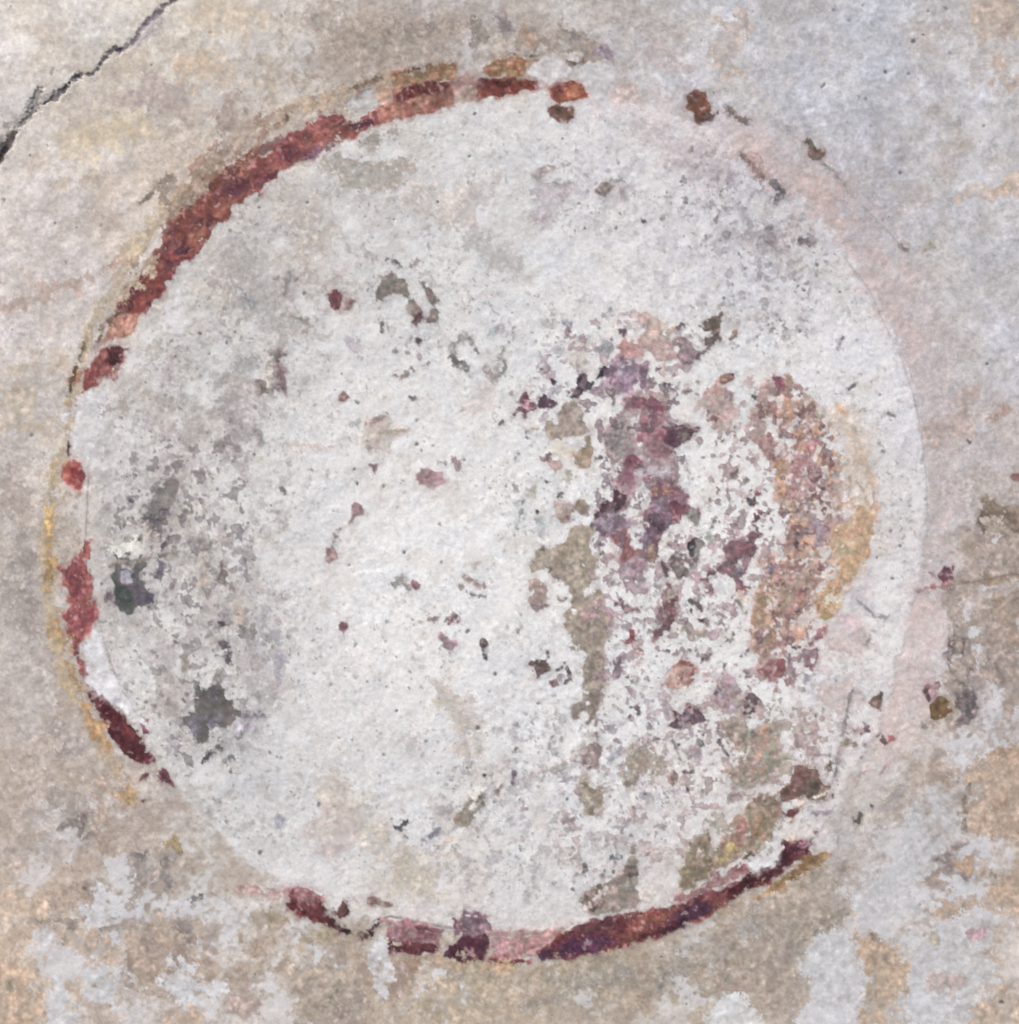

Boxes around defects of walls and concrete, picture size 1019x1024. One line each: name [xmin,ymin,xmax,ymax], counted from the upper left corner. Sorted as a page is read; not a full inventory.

crack [0,0,184,171]
peeling [523,53,576,94]
peeling [732,147,775,186]
peeling [768,107,858,200]
peeling [891,235,944,258]
peeling [251,345,293,399]
peeling [94,495,234,592]
peeling [315,254,903,918]
peeling [73,879,126,933]